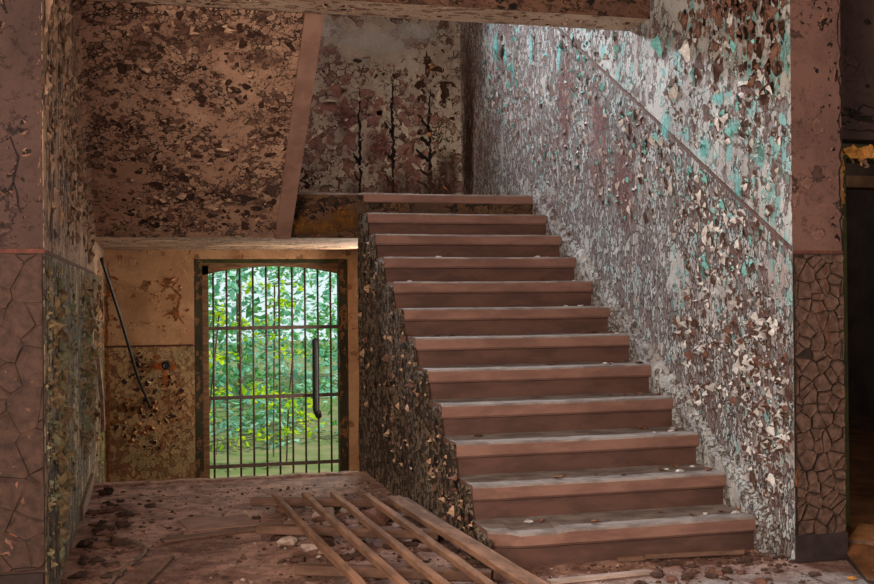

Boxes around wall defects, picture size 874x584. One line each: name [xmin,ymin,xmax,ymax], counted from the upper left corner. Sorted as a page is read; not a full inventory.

crack [2,136,22,214]
crack [0,254,52,582]
peeling [0,0,189,573]
peeling [89,0,296,234]
peeling [298,49,458,192]
flaking render [355,242,473,535]
peeling [483,0,793,515]
peeling [800,0,833,34]
crack [793,0,874,536]